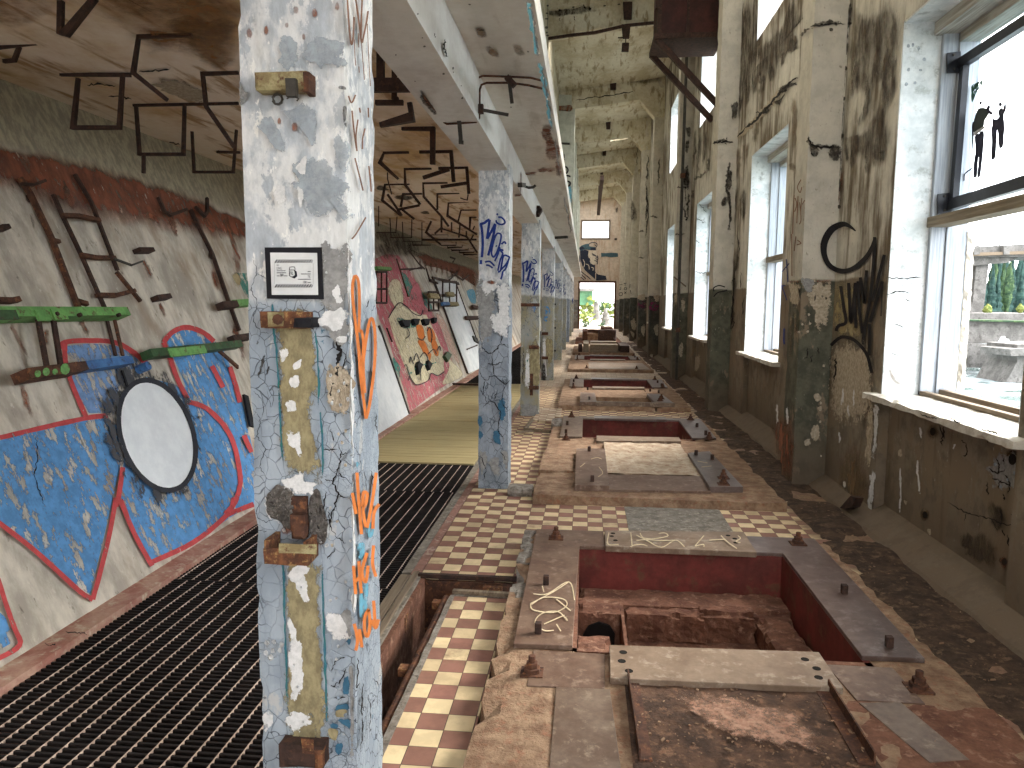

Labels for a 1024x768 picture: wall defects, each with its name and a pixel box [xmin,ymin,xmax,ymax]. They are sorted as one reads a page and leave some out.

peeling [274,103,355,220]
damp [721,130,755,230]
crack [713,78,797,145]
damp [731,0,800,119]
crack [806,136,842,161]
damp [839,3,896,191]
peeling [280,348,302,388]
peeling [287,431,302,458]
crack [323,429,374,558]
peeling [476,279,511,342]
flaking render [804,338,879,509]
crack [921,413,1016,546]